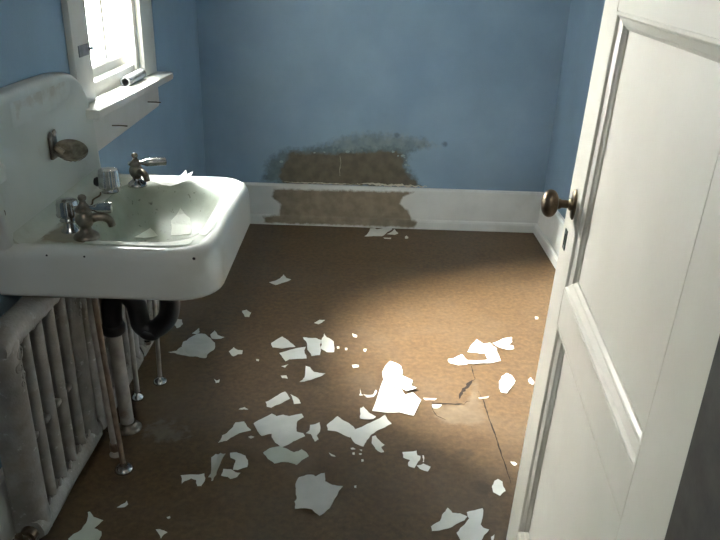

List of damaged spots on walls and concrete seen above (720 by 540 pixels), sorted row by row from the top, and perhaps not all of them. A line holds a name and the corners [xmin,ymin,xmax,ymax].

peeling [252,124,448,239]
crack [423,366,511,482]